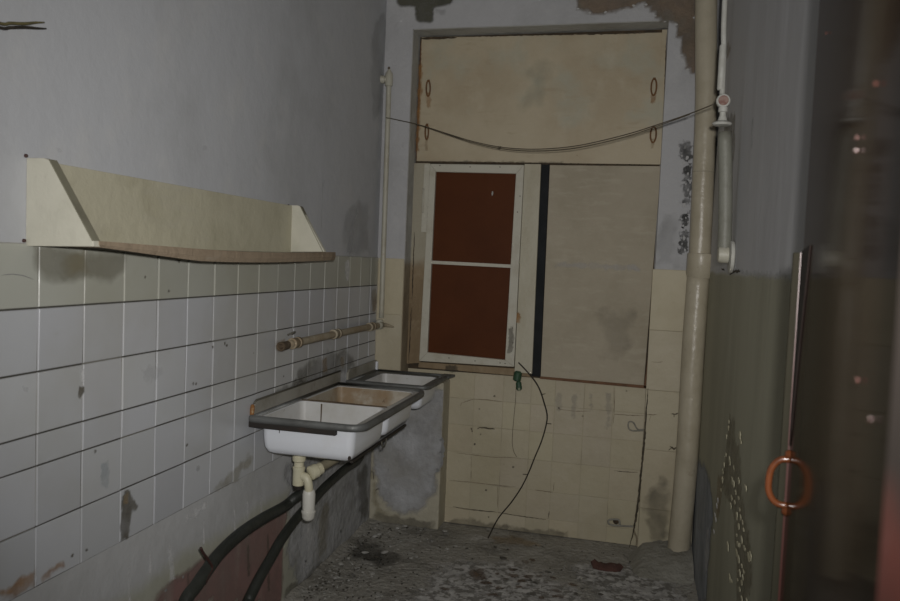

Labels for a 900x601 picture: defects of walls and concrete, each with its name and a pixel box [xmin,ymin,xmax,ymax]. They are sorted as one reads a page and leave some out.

peeling [577,0,695,73]
water stain [122,490,137,539]
peeling [194,390,445,601]
crack [613,391,678,547]
peeling [158,559,206,601]